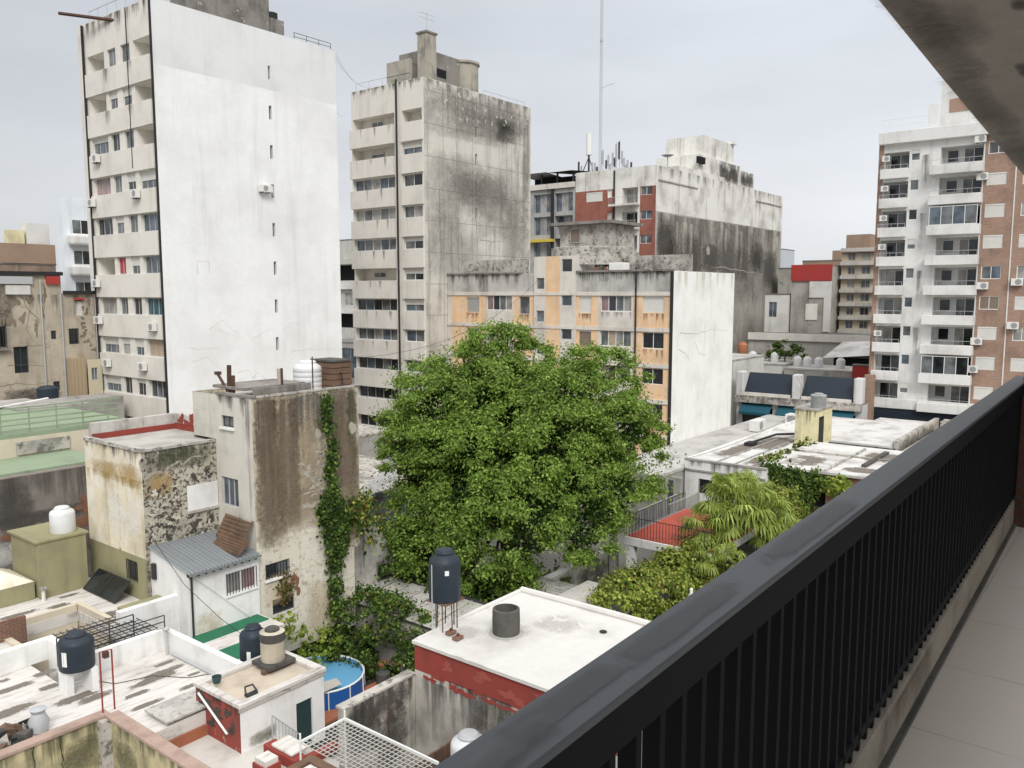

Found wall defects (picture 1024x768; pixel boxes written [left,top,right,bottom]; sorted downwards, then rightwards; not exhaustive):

damp [442,88,514,141]
damp [657,213,779,284]
flaking render [0,282,47,337]
flaking render [80,298,96,351]
damp [255,388,358,543]
flaking render [145,478,214,546]
peeling [423,661,539,713]
damp [47,722,95,768]
damp [349,677,411,760]